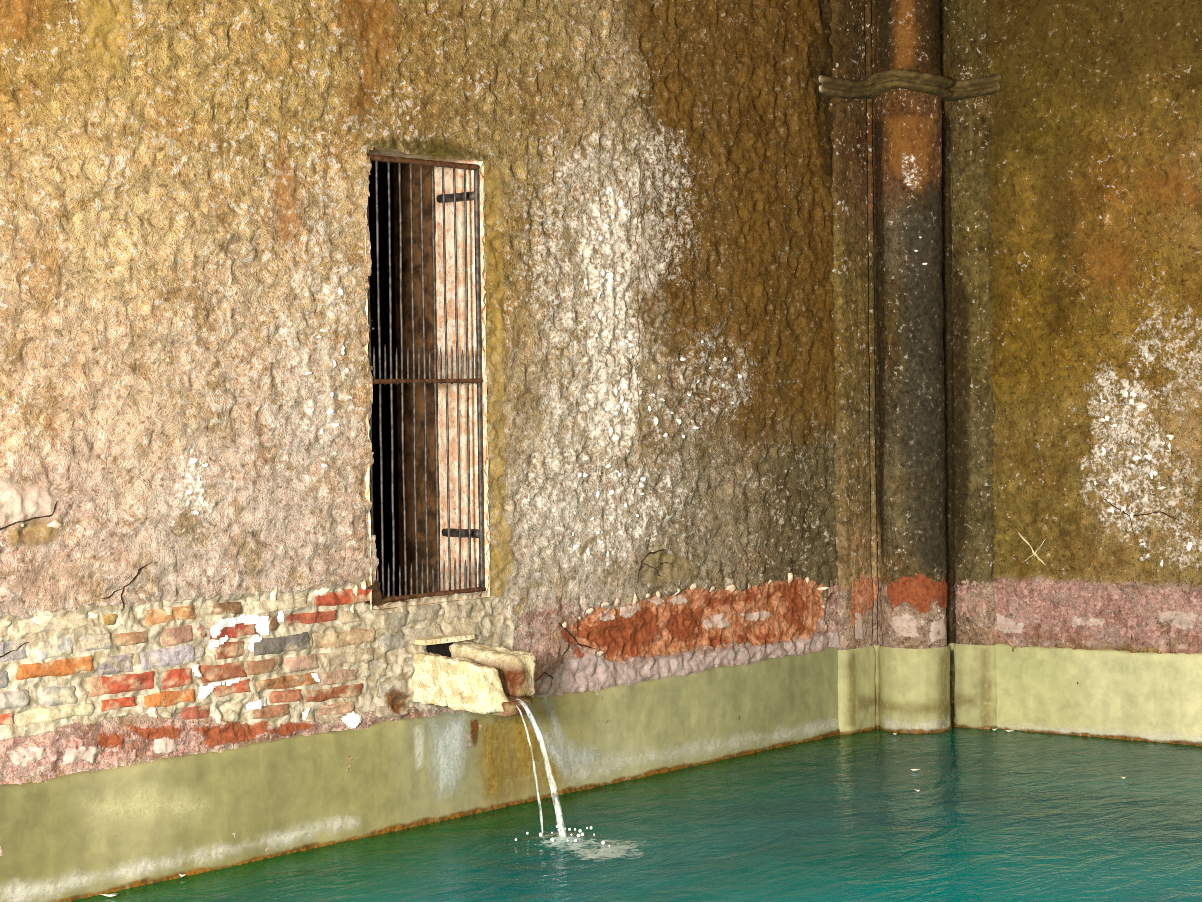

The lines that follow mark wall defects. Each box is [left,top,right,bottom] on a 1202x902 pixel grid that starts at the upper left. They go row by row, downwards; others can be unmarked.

water stain [515,0,837,573]
water stain [1080,309,1202,567]
crack [102,563,150,612]
flaking render [0,579,515,785]
peeling [532,573,1202,699]